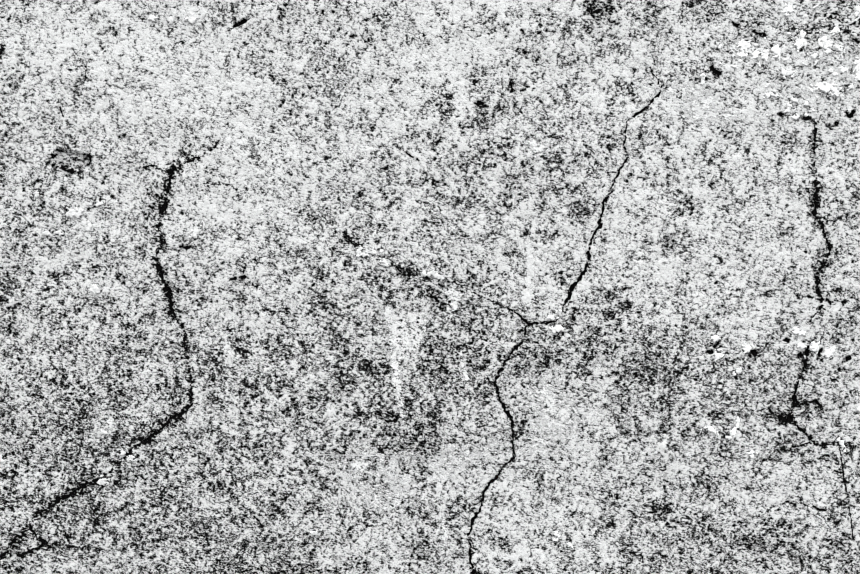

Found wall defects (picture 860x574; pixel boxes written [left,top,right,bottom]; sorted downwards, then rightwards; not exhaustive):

crack [0,135,222,569]
crack [342,231,363,250]
crack [383,67,663,574]
crack [759,115,860,540]